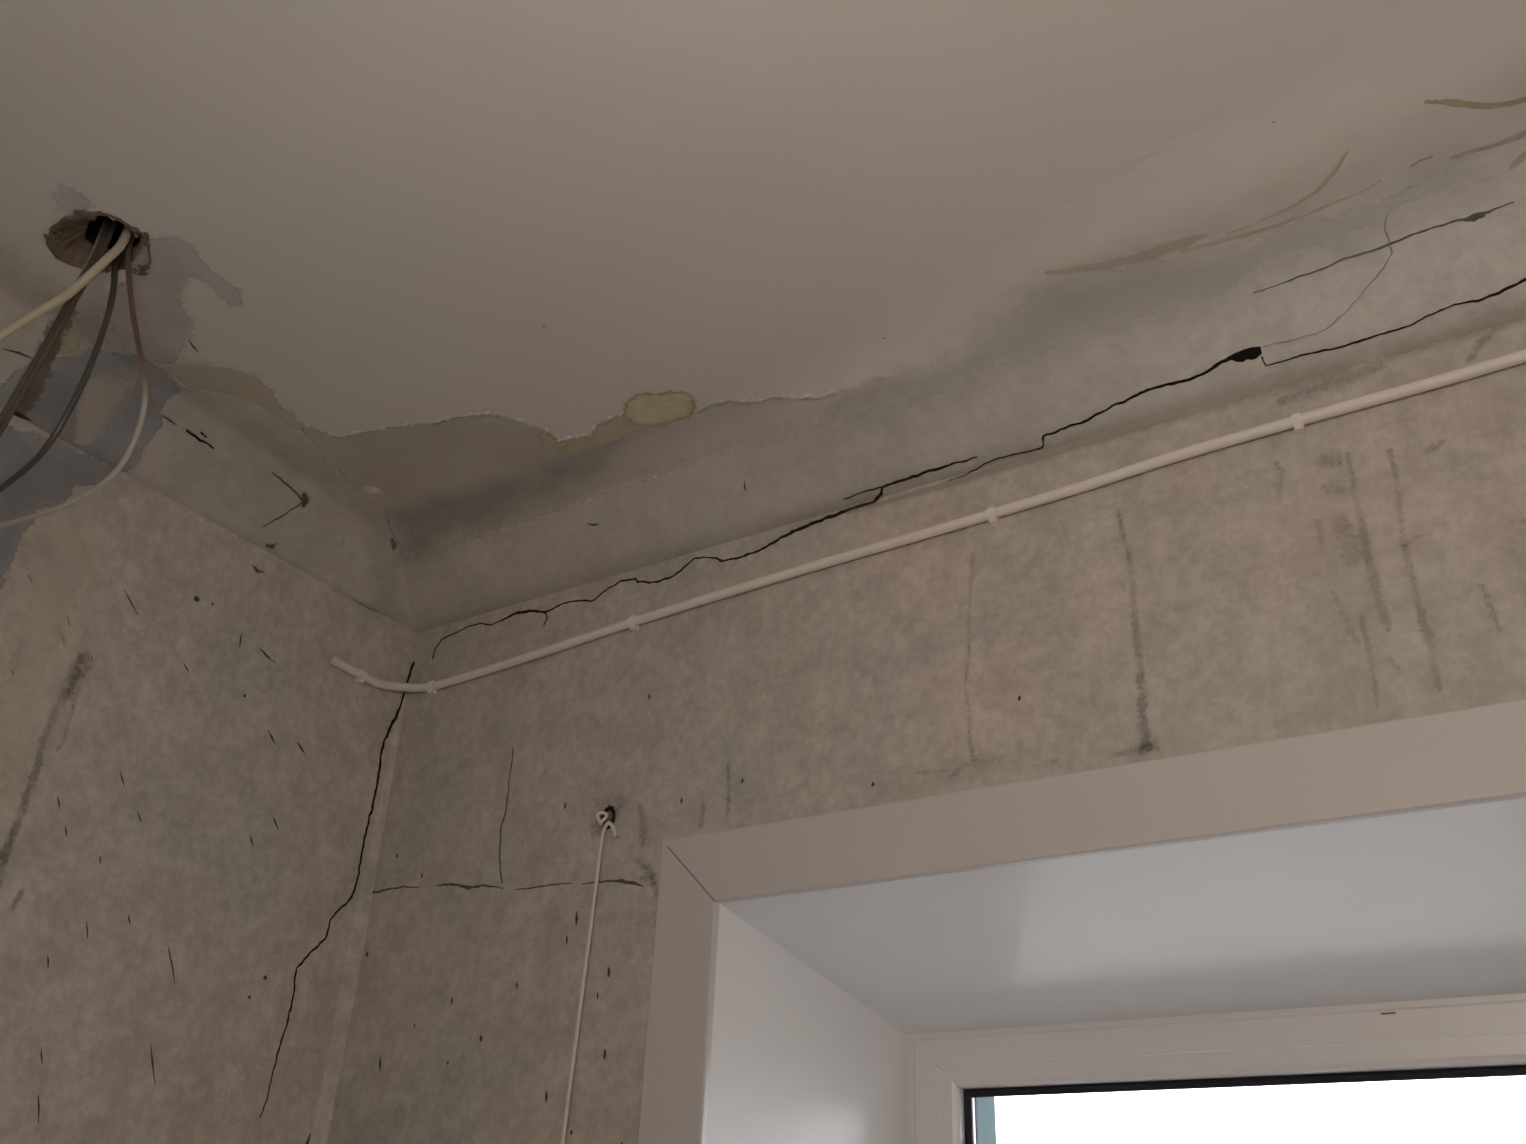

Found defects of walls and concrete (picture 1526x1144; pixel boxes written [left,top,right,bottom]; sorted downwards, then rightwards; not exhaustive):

damp [1425,98,1526,108]
damp [1411,131,1526,168]
spalling [85,211,141,249]
damp [1048,153,1372,274]
flaking render [1230,346,1262,362]
peeling [297,379,898,557]
crack [260,184,1526,1117]
spalling [601,805,617,830]